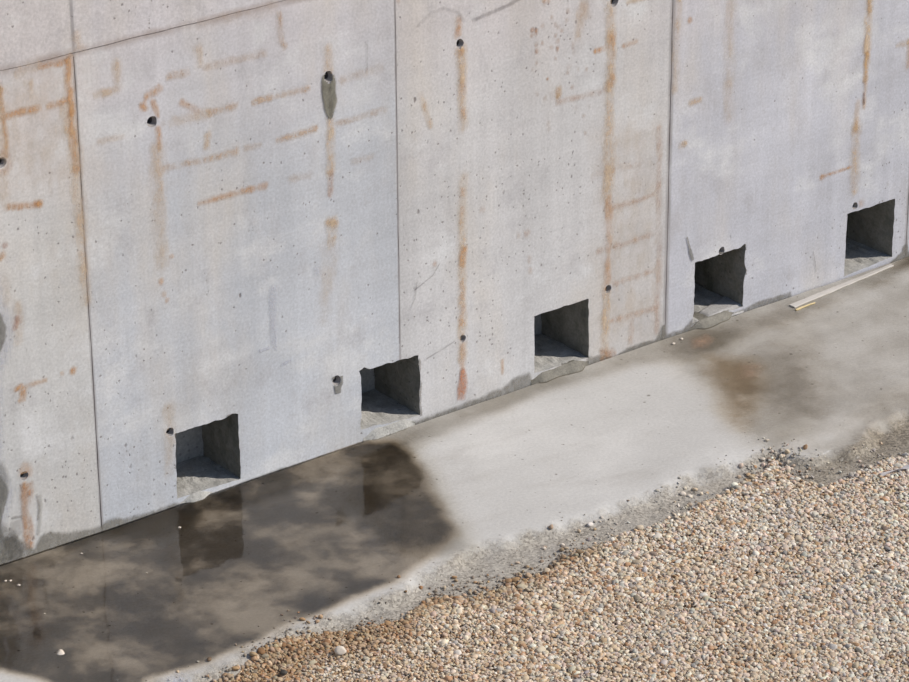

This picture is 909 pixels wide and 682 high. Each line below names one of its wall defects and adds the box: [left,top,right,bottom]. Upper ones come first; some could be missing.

rust [458,369,466,396]
damp [0,477,179,566]